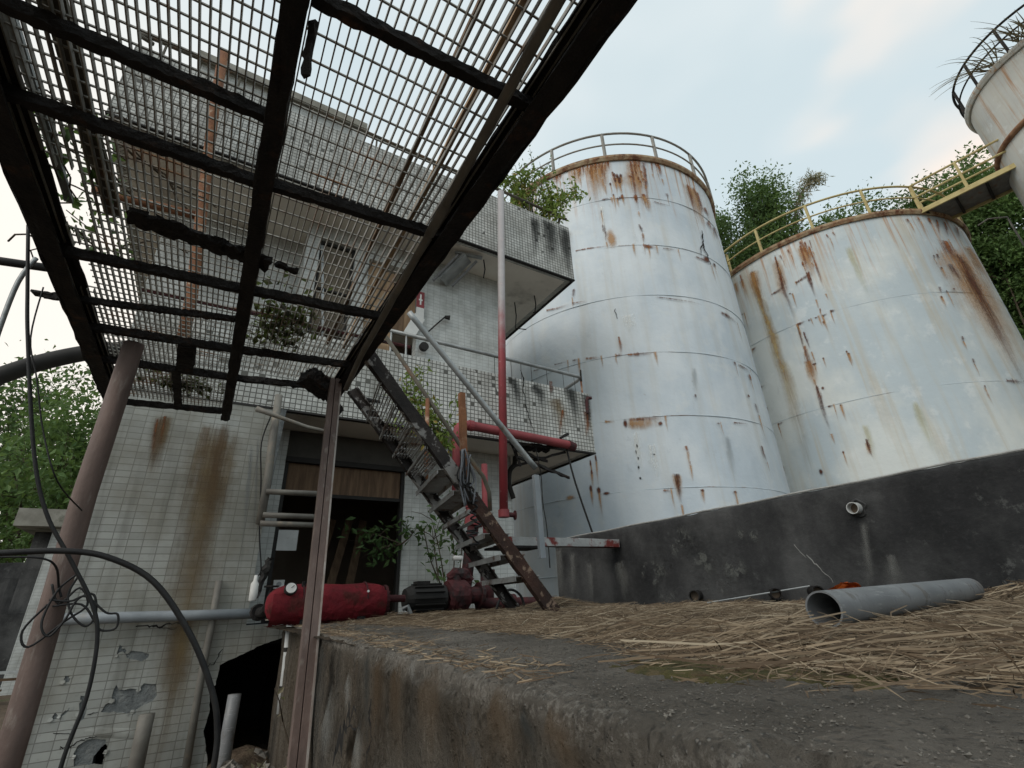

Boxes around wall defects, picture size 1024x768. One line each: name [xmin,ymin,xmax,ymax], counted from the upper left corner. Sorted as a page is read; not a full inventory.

rust [574,160,669,212]
rust [687,185,717,235]
leakage [531,219,570,257]
rust [907,217,999,328]
rust [734,240,819,382]
rust [797,294,844,414]
leakage [566,388,590,411]
rust [624,416,666,427]
rust [663,446,692,515]
rust [185,440,231,605]
spalling [101,683,157,715]
spalling [71,739,109,766]